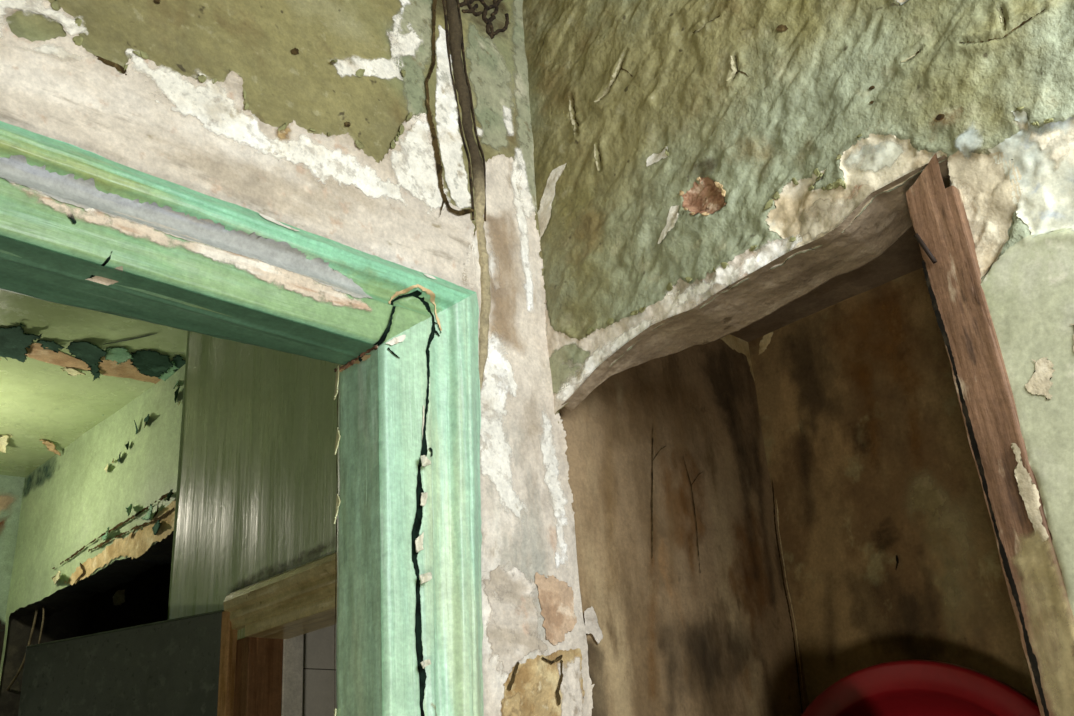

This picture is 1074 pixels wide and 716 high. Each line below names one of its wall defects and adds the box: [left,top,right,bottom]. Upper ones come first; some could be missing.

peeling [0,0,481,354]
peeling [0,324,186,405]
peeling [466,0,1074,716]
peeling [0,434,12,453]
peeling [52,490,176,585]
peeling [104,414,149,473]
crack [334,284,442,716]
crack [331,585,339,716]